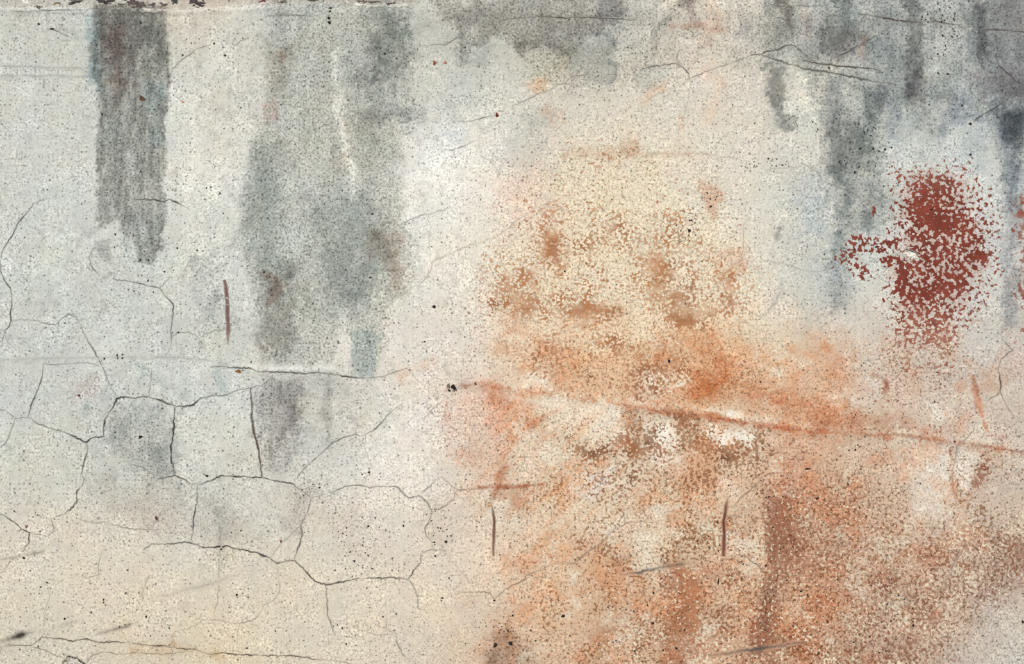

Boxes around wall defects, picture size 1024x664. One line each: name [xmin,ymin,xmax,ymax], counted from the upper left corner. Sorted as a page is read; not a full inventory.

damp [80,9,176,269]
crack [0,195,644,664]
damp [176,0,1024,482]
rust [393,0,1024,664]